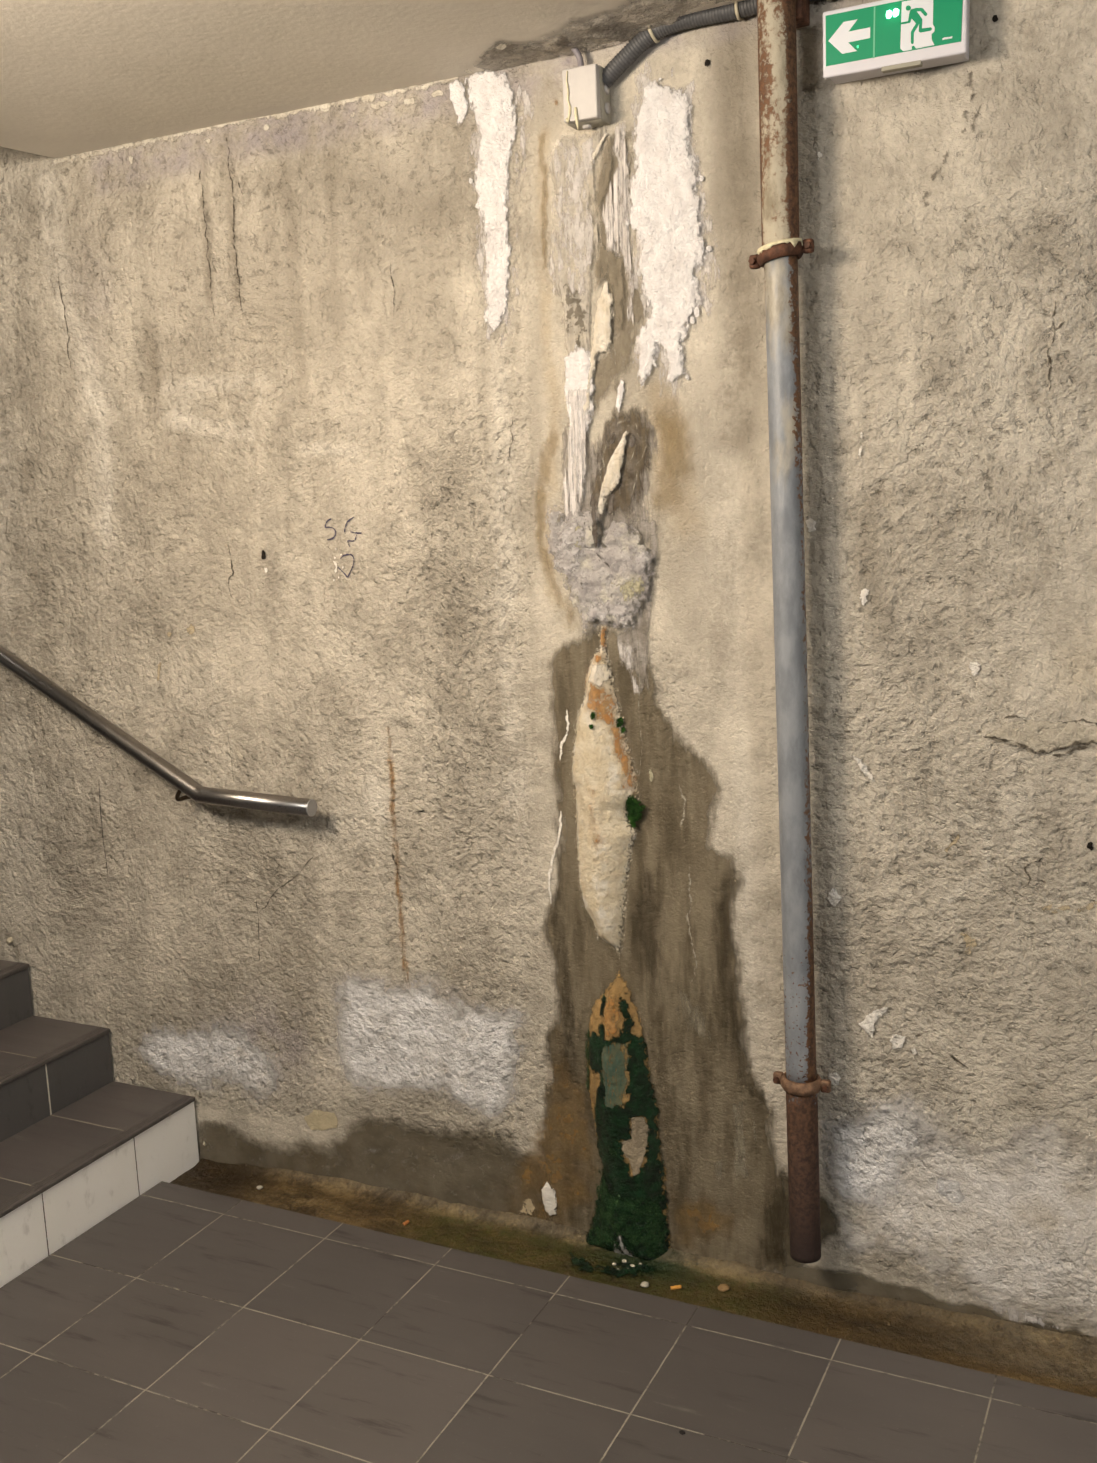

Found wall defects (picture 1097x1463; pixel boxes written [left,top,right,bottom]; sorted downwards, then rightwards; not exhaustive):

spalling [561,281,587,349]
spalling [591,408,653,516]
leakage [198,64,1097,1337]
corrosion [392,853,410,992]